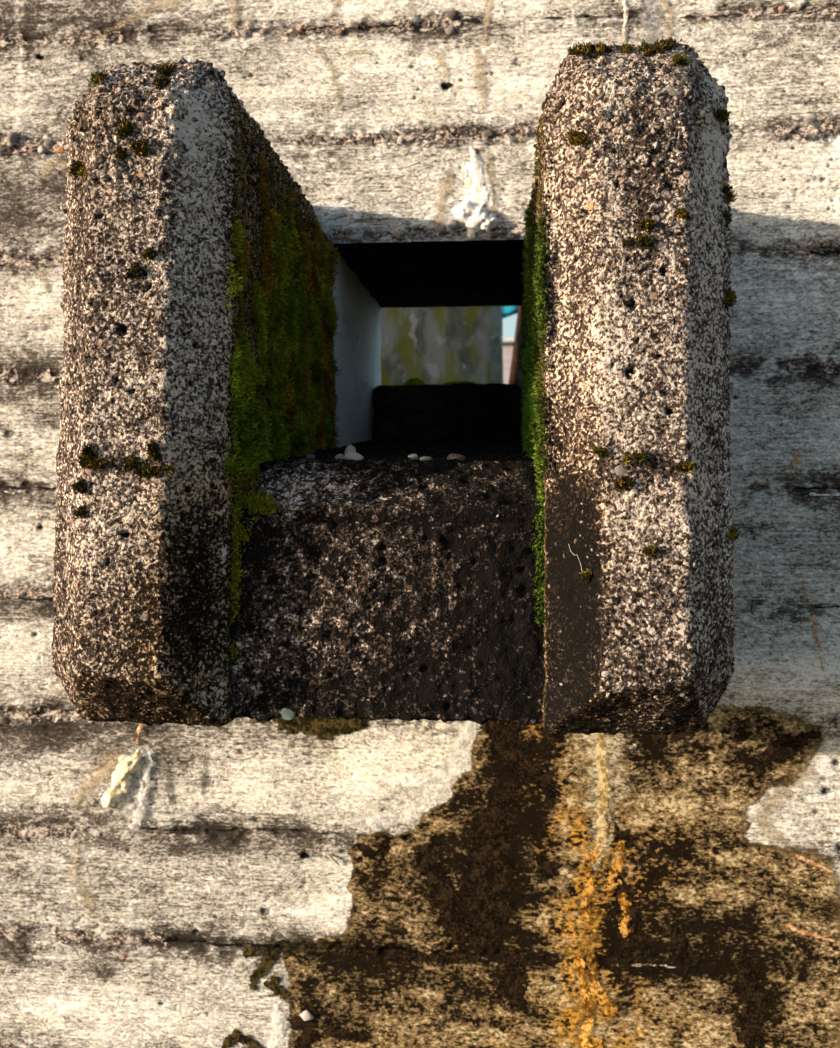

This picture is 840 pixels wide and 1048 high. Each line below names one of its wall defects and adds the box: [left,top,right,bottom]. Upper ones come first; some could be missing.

water stain [433,147,498,239]
water stain [76,723,174,832]
water stain [221,705,840,1048]
rust [559,837,634,938]
rust [563,958,618,1048]